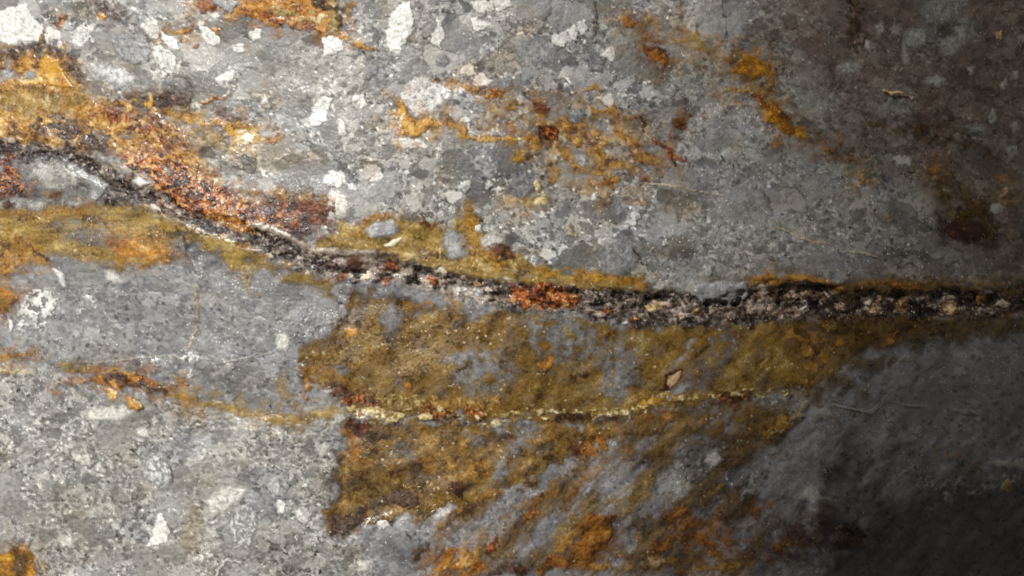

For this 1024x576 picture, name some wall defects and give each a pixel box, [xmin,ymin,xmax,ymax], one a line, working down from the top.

corrosion [85,0,122,25]
corrosion [0,15,336,238]
corrosion [391,78,688,190]
corrosion [719,49,808,147]
leakage [0,200,333,297]
crack [0,138,1024,329]
crack [53,288,199,367]
corrosion [57,362,346,426]
crack [315,358,799,435]
corrosion [0,545,37,576]
corrosion [409,482,740,576]
leakage [449,422,765,576]